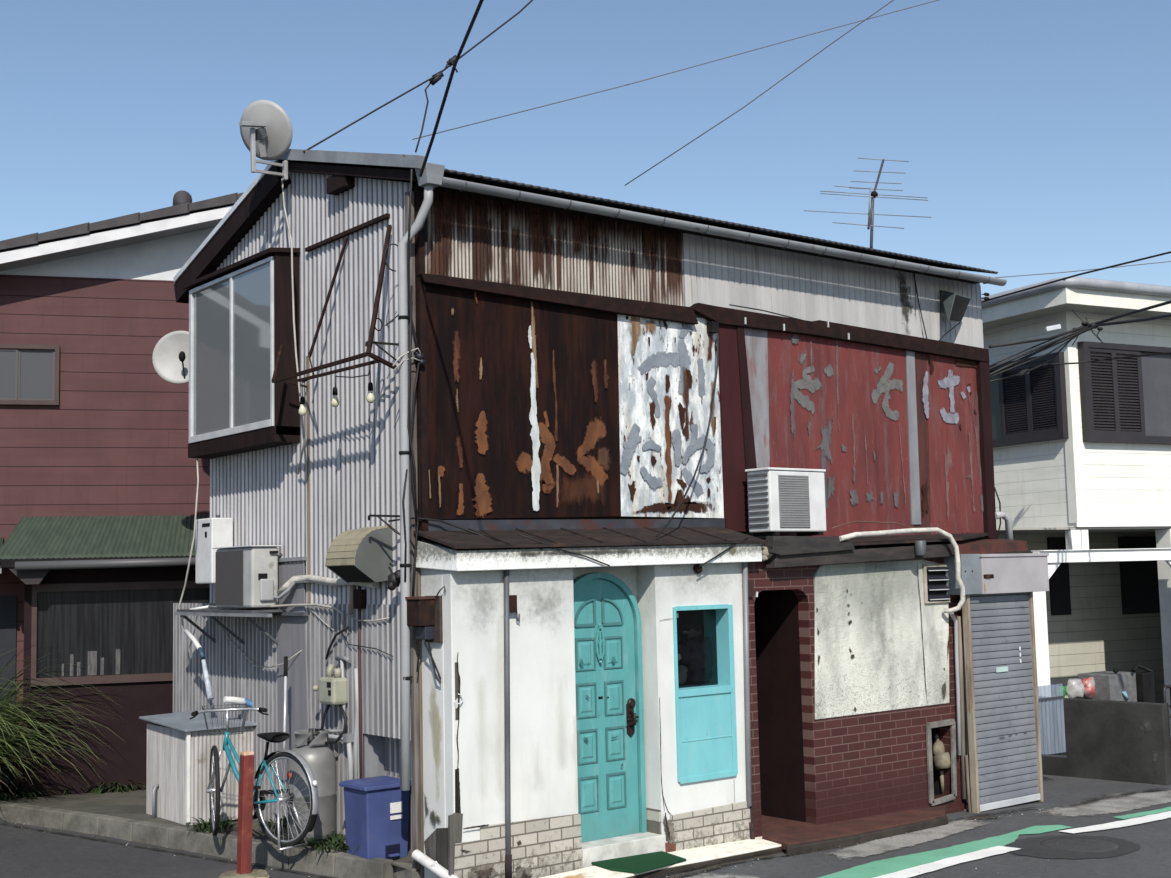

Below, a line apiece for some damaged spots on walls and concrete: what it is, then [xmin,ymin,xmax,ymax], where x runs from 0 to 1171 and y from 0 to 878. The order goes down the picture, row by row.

corrosion [430,189,682,302]
corrosion [626,316,676,355]
peeling [563,448,610,504]
corrosion [628,367,715,514]